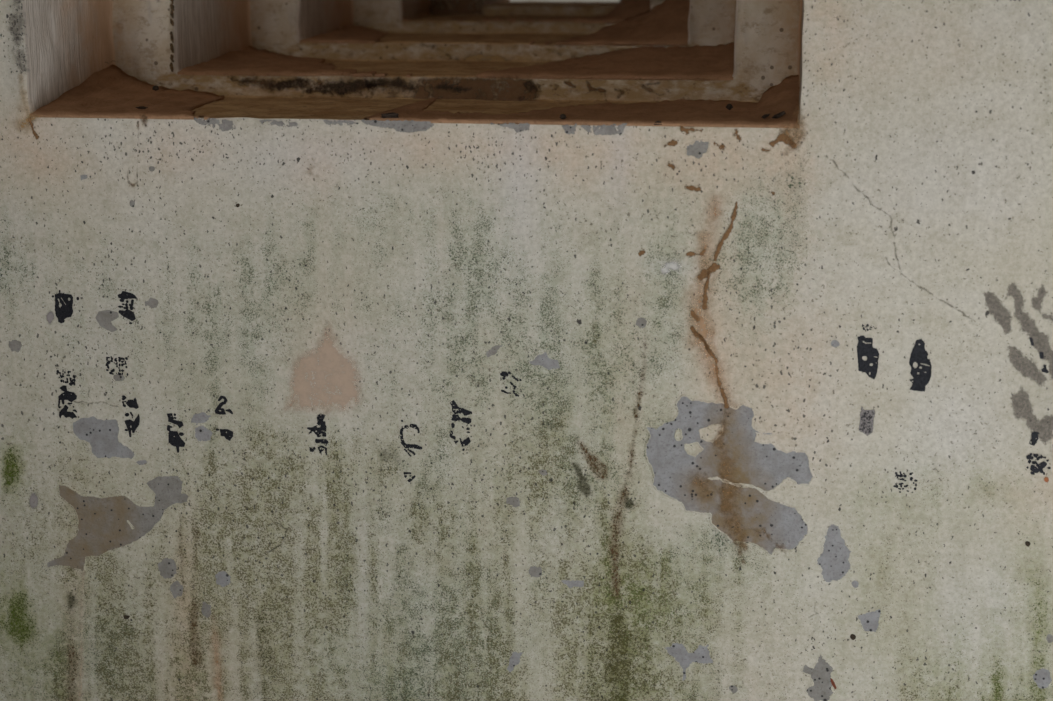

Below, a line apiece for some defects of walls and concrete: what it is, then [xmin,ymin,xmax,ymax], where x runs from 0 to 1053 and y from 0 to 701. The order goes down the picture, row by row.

rust [664,126,703,147]
rust [761,122,803,152]
rust [686,202,738,409]
damp [63,590,81,701]
peeling [46,415,190,573]
damp [177,525,219,667]
damp [576,437,608,482]
damp [609,486,634,599]
peeling [644,394,859,588]
peeling [799,653,836,701]